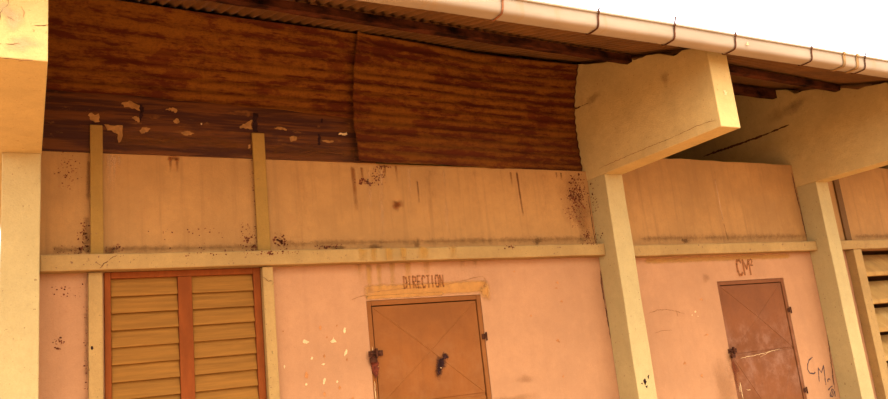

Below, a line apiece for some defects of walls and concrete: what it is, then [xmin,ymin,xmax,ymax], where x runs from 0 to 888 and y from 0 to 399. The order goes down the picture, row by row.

peeling [88,113,123,142]
peeling [121,101,150,134]
crack [705,125,788,156]
damp [561,173,603,245]
damp [185,224,299,257]